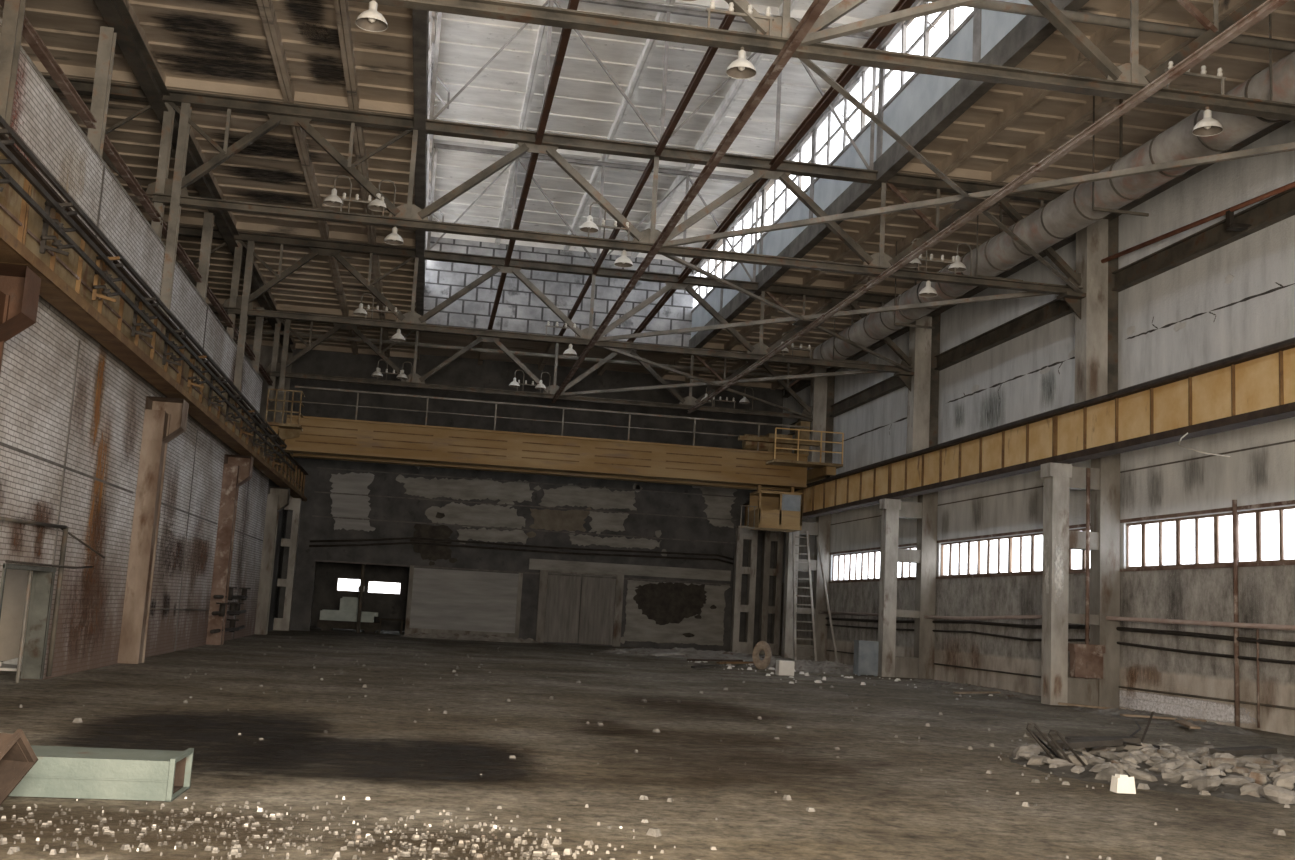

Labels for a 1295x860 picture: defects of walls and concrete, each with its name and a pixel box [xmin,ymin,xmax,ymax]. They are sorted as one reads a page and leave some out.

leakage [153,0,290,81]
leakage [286,0,345,85]
corrosion [68,355,110,647]
peeling [330,472,375,532]
peeling [396,466,667,566]
peeling [620,580,730,646]